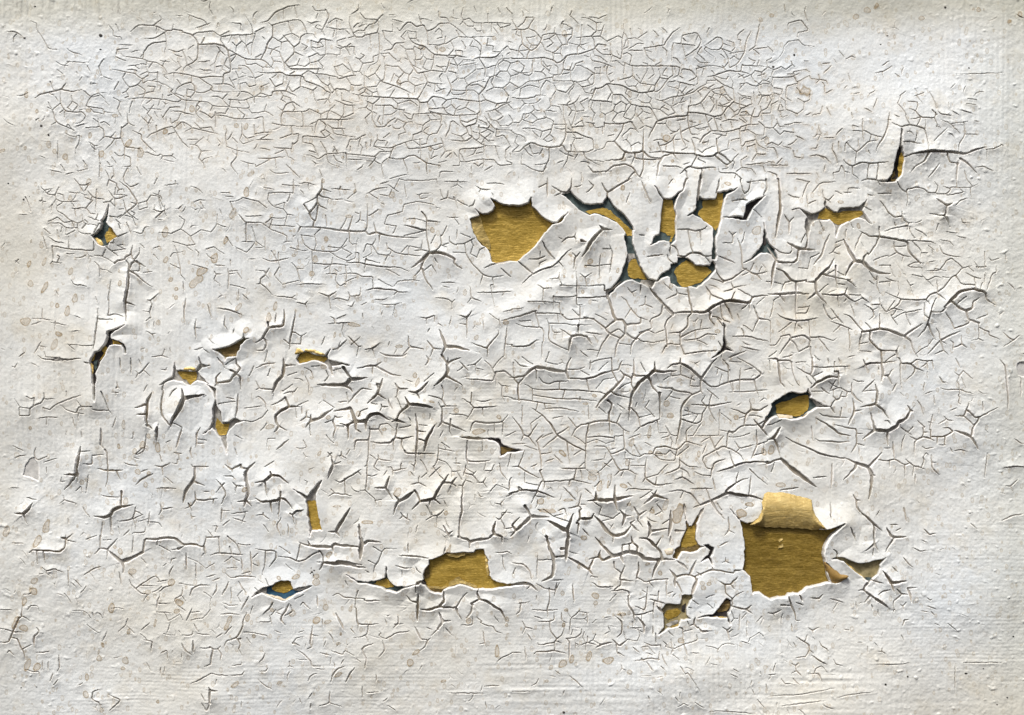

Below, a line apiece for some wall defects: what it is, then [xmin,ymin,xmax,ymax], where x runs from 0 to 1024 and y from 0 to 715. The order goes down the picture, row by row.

crack [37,5,831,344]
peeling [464,169,785,307]
peeling [792,122,912,249]
peeling [153,325,258,461]
crack [244,89,1017,682]
peeling [755,382,837,435]
crack [36,520,100,586]
crack [61,349,390,711]
peeling [339,542,537,602]
peeling [651,492,893,642]
crack [0,593,121,708]
crack [676,627,862,715]